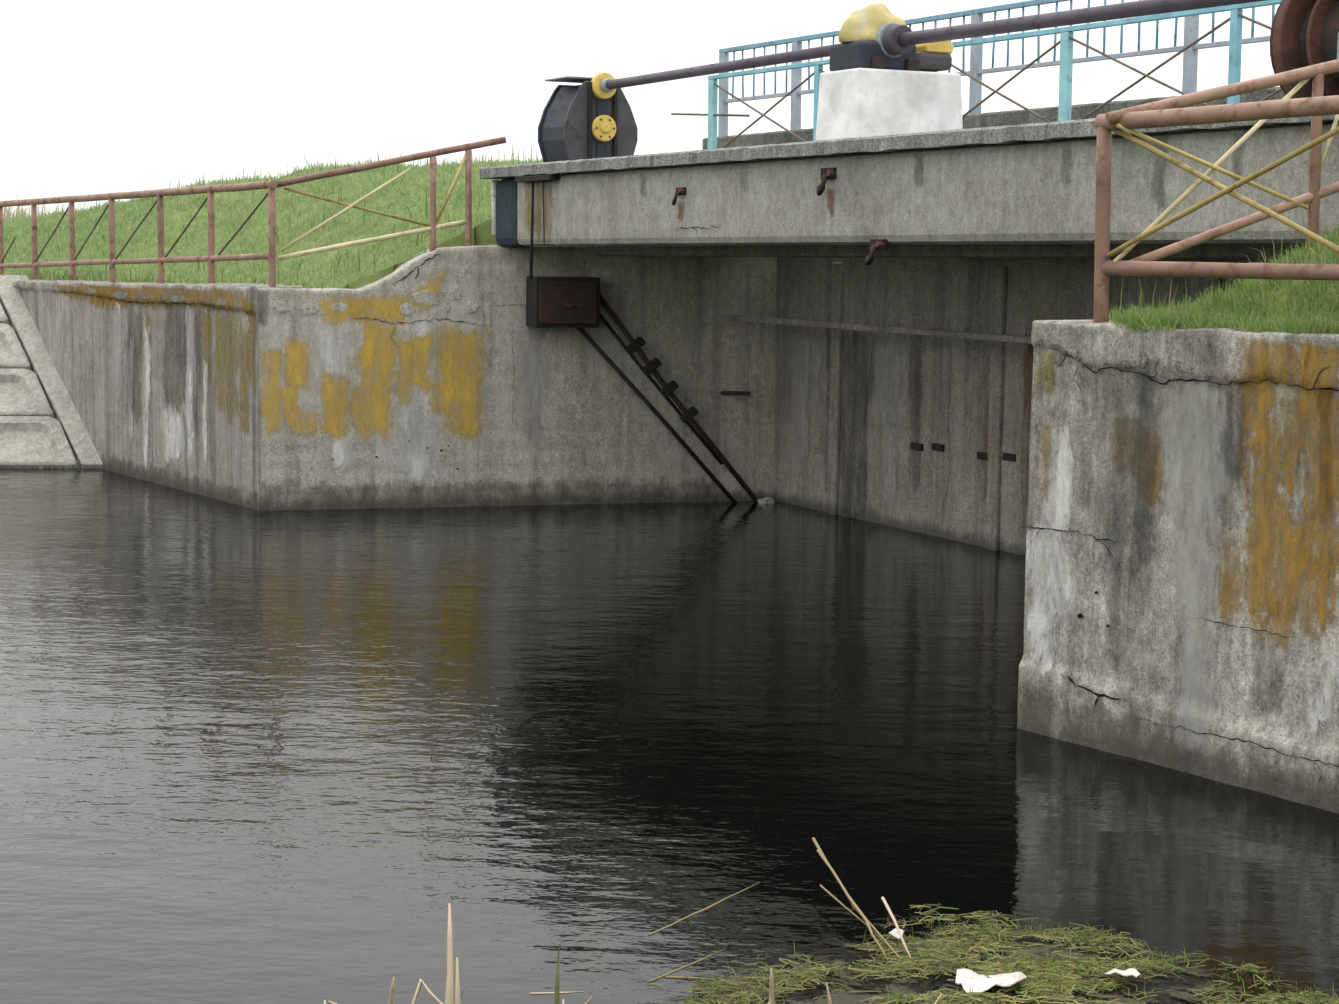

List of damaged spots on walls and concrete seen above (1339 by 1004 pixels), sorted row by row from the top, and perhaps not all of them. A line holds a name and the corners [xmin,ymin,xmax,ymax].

damp [89,286,275,509]
crack [1020,346,1339,561]
crack [1067,676,1339,783]
damp [1307,652,1339,737]